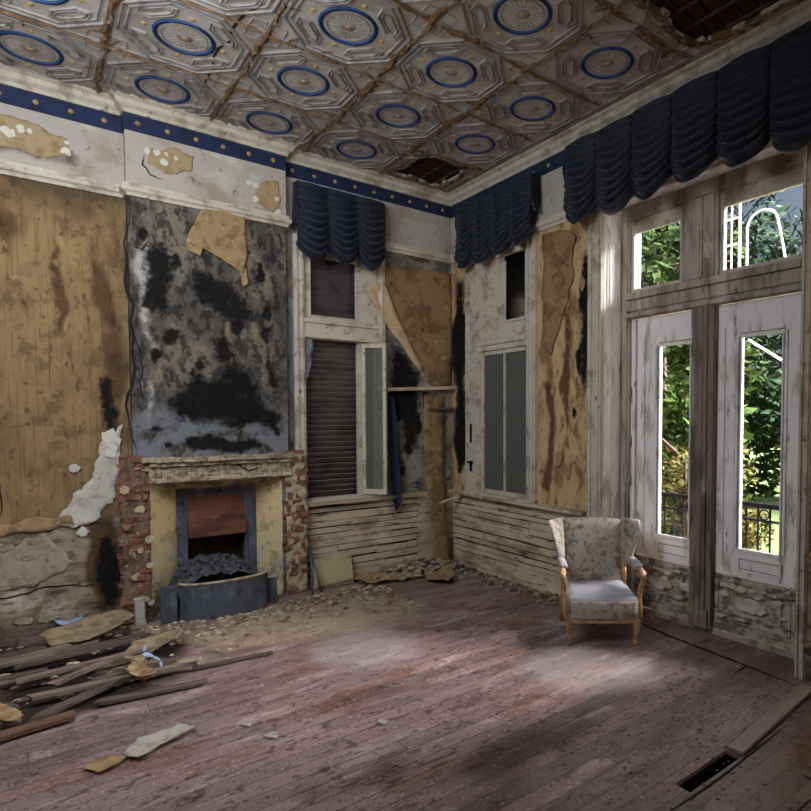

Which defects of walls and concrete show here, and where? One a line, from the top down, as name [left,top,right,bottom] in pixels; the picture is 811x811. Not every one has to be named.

crack [0,0,690,175]
peeling [0,114,73,158]
peeling [144,147,194,174]
peeling [246,179,282,214]
damp [134,226,181,322]
damp [151,327,180,363]
mould [185,434,262,454]
damp [190,271,276,387]
damp [286,296,294,415]
mould [388,345,422,456]
peeling [0,538,74,591]
flaking render [59,424,155,625]